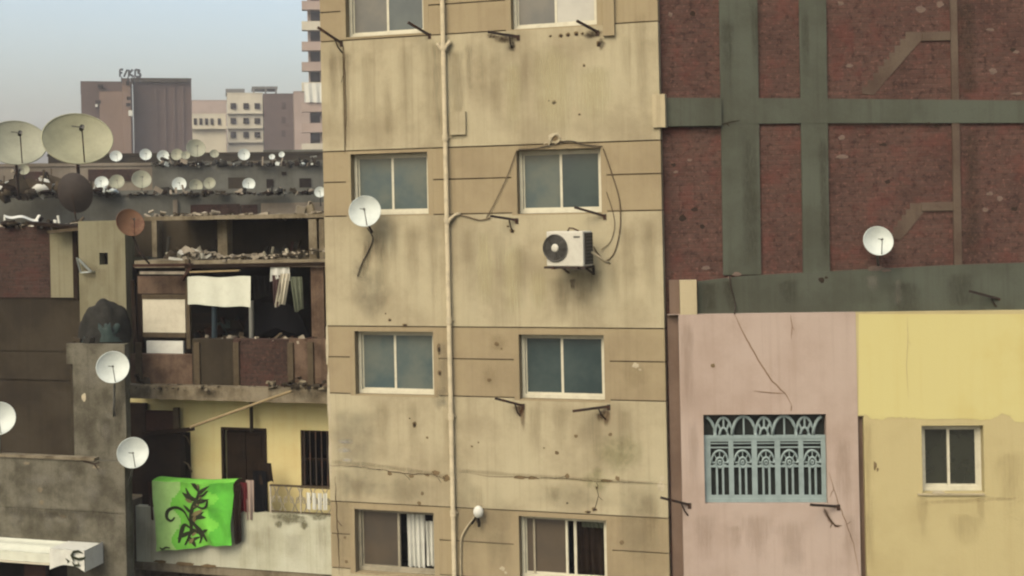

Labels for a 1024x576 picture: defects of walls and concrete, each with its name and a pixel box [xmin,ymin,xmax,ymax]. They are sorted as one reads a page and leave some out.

crack [735,316,792,410]
crack [527,476,667,508]
crack [824,477,859,572]